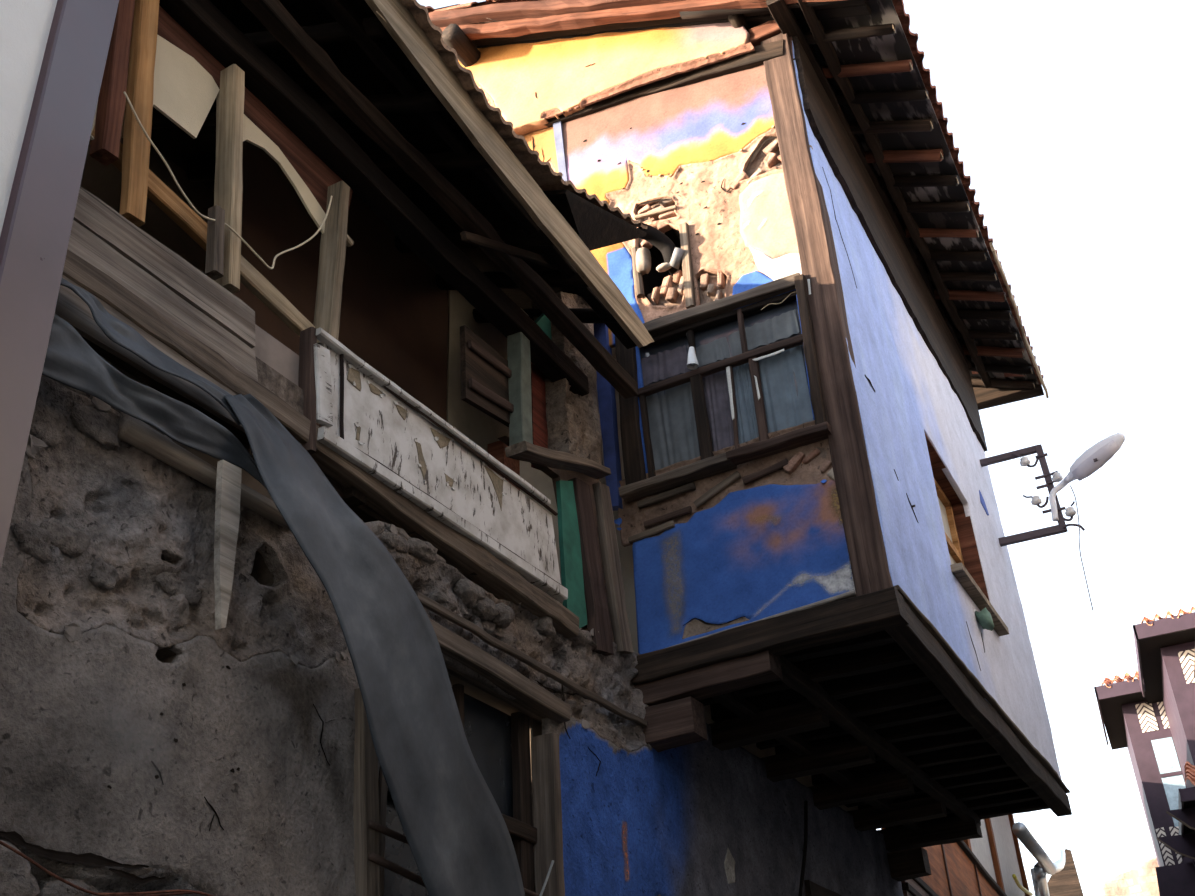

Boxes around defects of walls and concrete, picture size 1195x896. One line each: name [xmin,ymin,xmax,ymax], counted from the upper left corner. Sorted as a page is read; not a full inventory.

flaking render [605,125,811,323]
peeling [347,364,407,420]
peeling [414,427,454,484]
peeling [483,462,506,511]
flaking render [16,377,347,669]
flaking render [376,524,652,752]
flaking render [682,617,749,639]